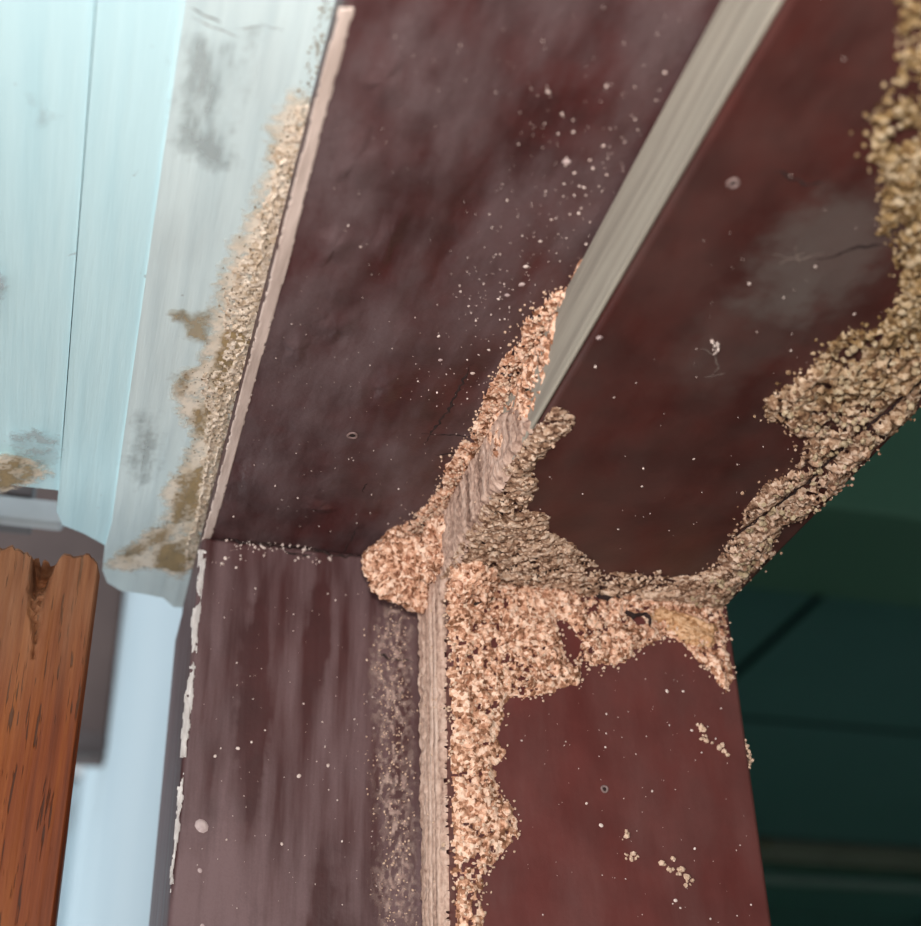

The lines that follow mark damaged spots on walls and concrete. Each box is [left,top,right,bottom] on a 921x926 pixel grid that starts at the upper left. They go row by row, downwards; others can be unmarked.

crack [815,244,882,260]
leakage [108,95,310,575]
leakage [0,431,55,491]